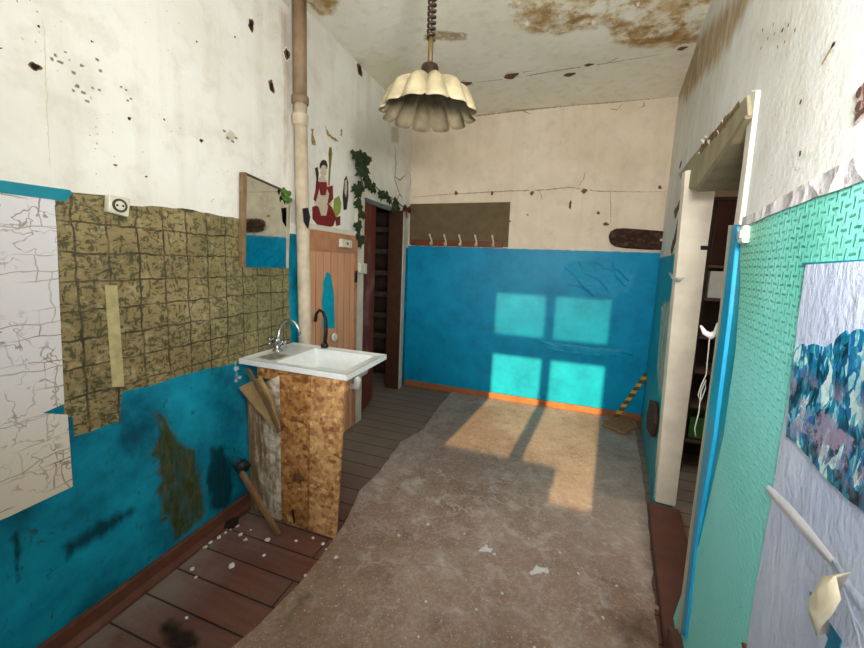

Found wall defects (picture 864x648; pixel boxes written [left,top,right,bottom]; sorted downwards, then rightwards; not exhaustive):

water stain [307,0,345,47]
water stain [499,0,761,113]
water stain [159,413,237,538]
water stain [56,500,144,568]
water stain [162,621,197,648]